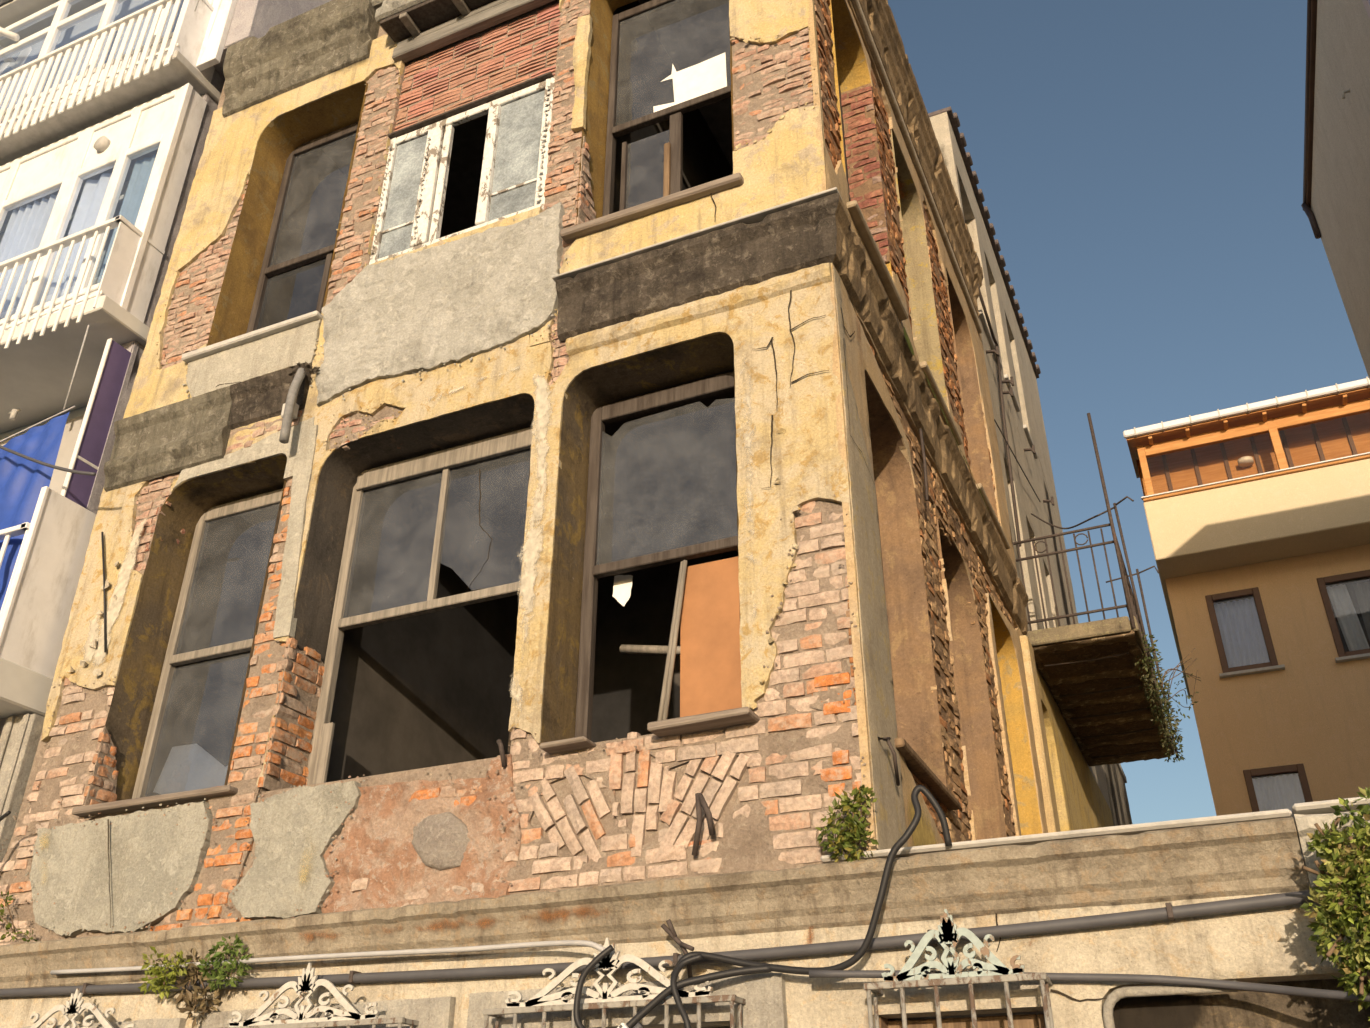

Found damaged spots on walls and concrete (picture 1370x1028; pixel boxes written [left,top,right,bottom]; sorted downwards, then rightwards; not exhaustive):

spalling [0,471,185,945]
spalling [160,175,250,369]
spalling [150,479,324,931]
spalling [329,406,403,451]
peeling [481,315,569,640]
spalling [537,0,596,267]
spalling [321,501,867,913]
crack [757,290,874,489]
spalling [730,0,913,335]
spalling [870,345,1016,843]